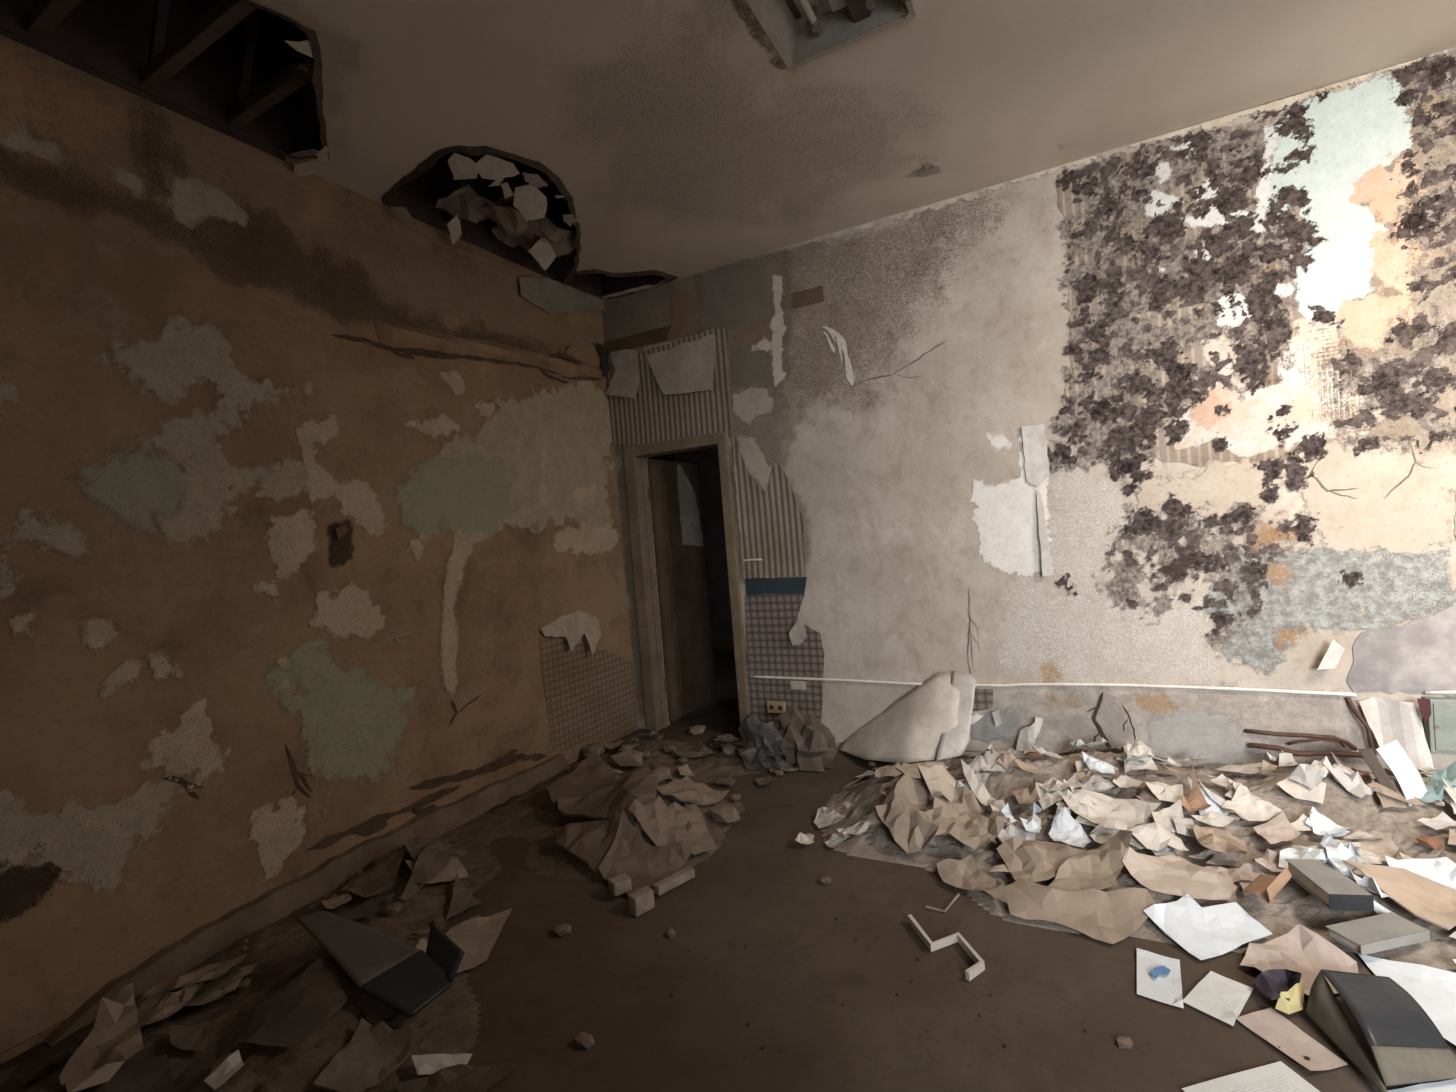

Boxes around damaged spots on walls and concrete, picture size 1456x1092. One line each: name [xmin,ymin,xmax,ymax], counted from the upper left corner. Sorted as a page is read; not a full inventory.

peeling [284,40,313,58]
peeling [447,214,462,245]
peeling [448,153,578,227]
peeling [519,238,605,314]
peeling [1106,58,1456,555]
crack [332,335,602,383]
peeling [731,275,787,492]
peeling [252,414,389,640]
peeling [969,424,1054,577]
spalling [439,528,487,697]
spalling [139,698,231,793]
spalling [248,796,308,882]